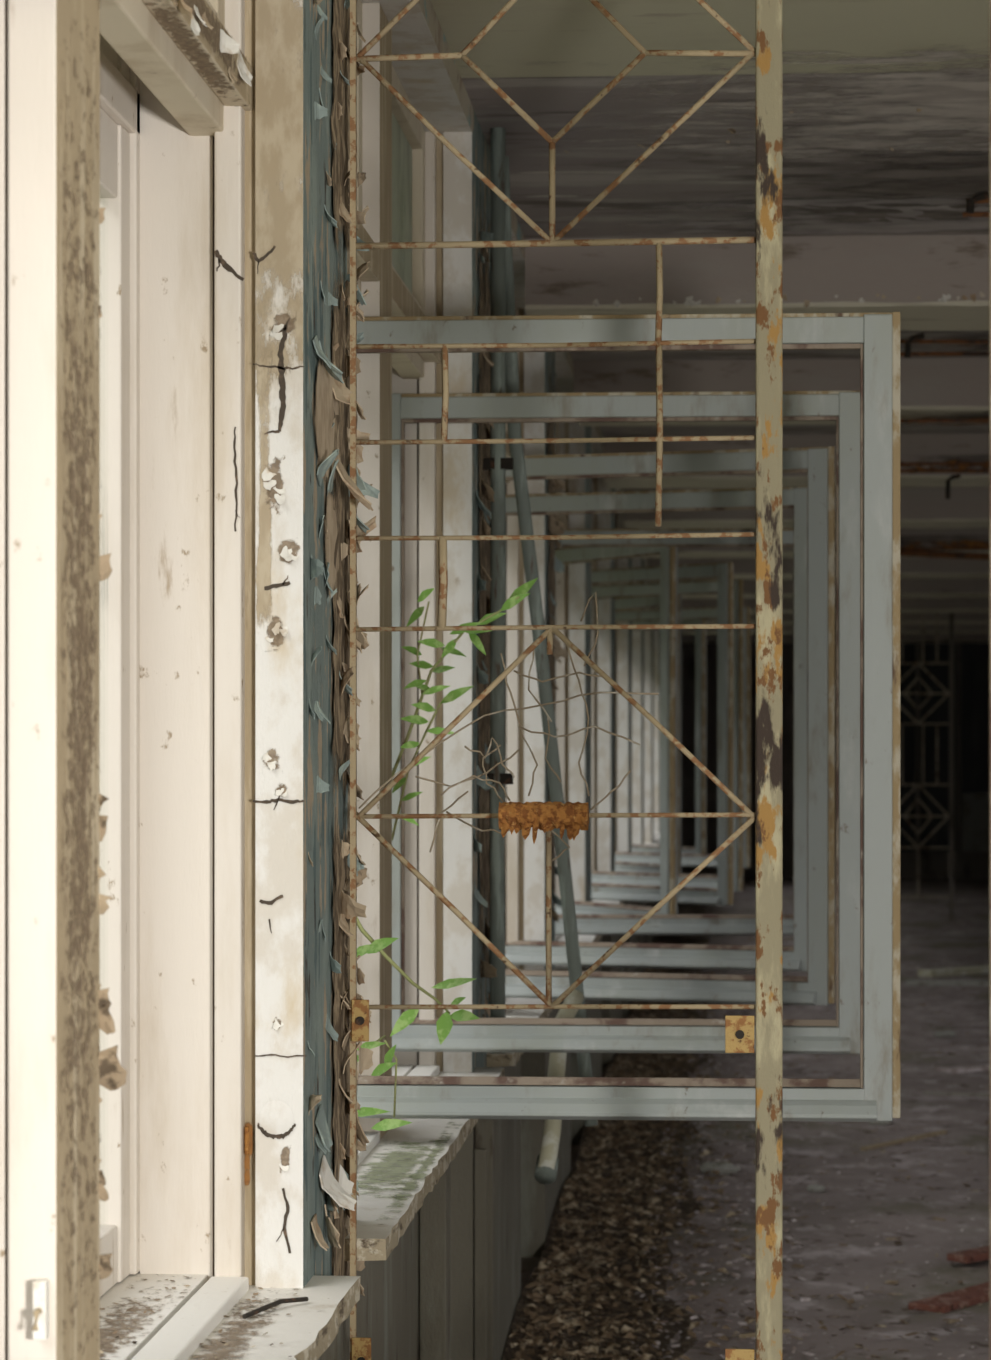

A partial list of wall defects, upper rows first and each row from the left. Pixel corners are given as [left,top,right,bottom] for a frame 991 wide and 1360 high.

peeling [146,0,253,106]
leakage [783,150,989,223]
spalling [270,314,297,340]
peeling [278,0,380,814]
spalling [262,457,286,513]
peeling [60,57,127,1353]
peeling [308,810,373,1296]
spalling [278,1146,290,1173]